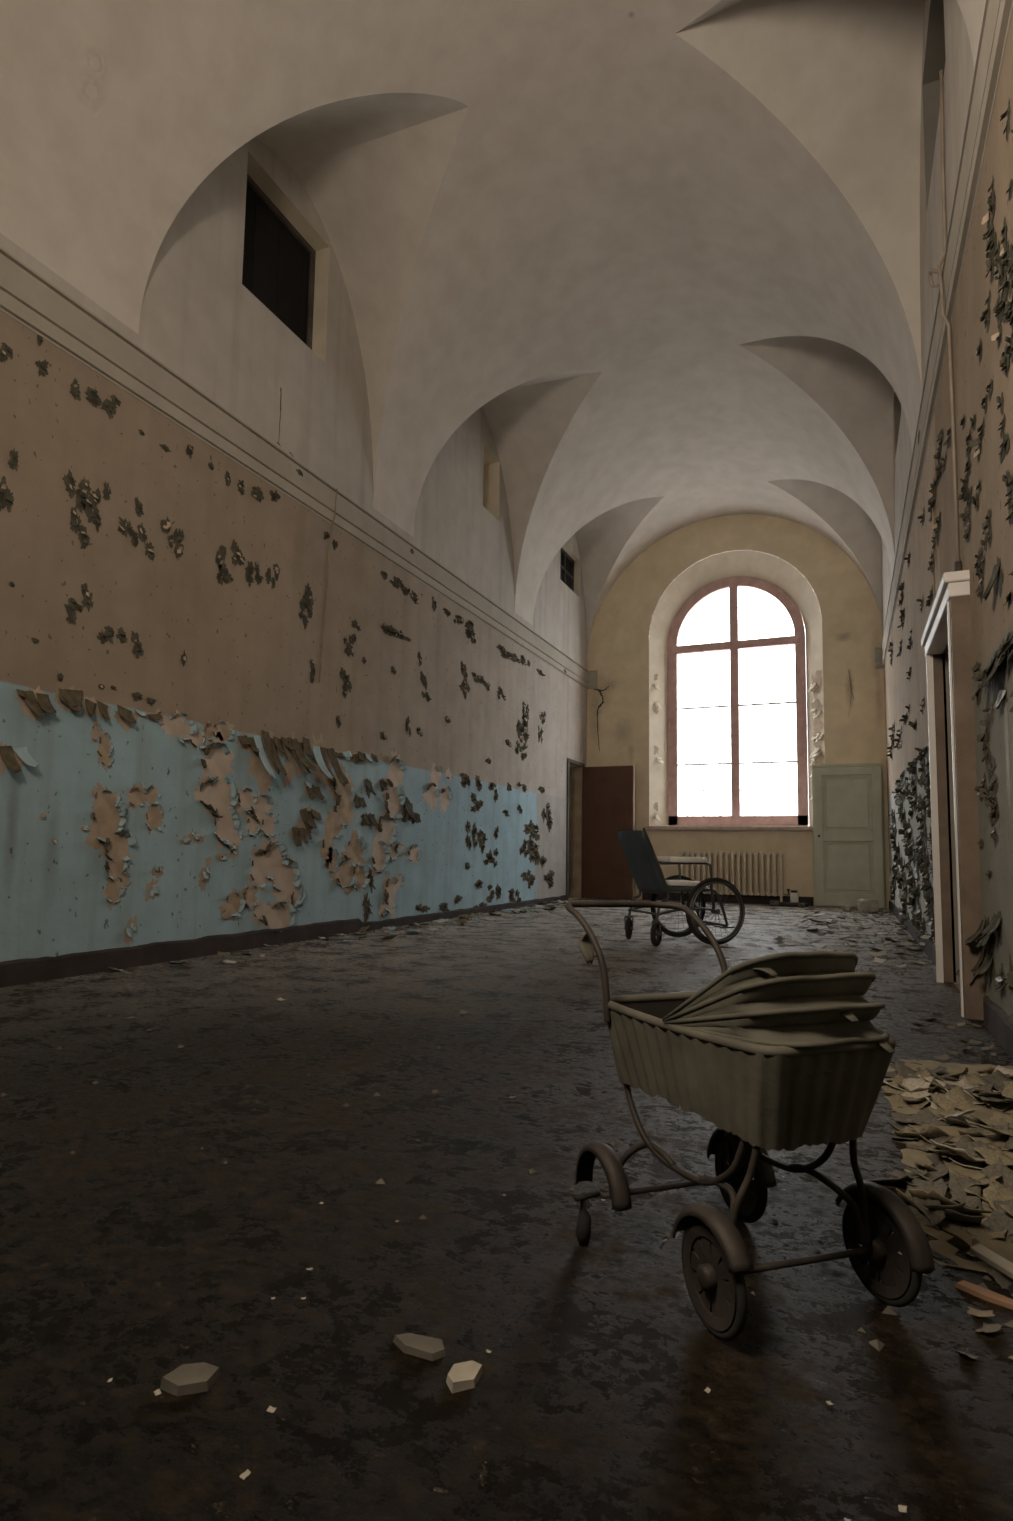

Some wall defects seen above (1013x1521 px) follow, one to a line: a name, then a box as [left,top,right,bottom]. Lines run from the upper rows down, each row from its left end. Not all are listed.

peeling [0,448,19,513]
peeling [62,469,184,561]
peeling [138,429,281,503]
peeling [888,176,1013,680]
peeling [64,583,93,625]
peeling [215,539,280,589]
peeling [380,570,476,644]
peeling [0,741,39,777]
peeling [14,619,555,947]
peeling [887,698,935,951]
peeling [972,631,1013,849]
peeling [956,911,1013,998]